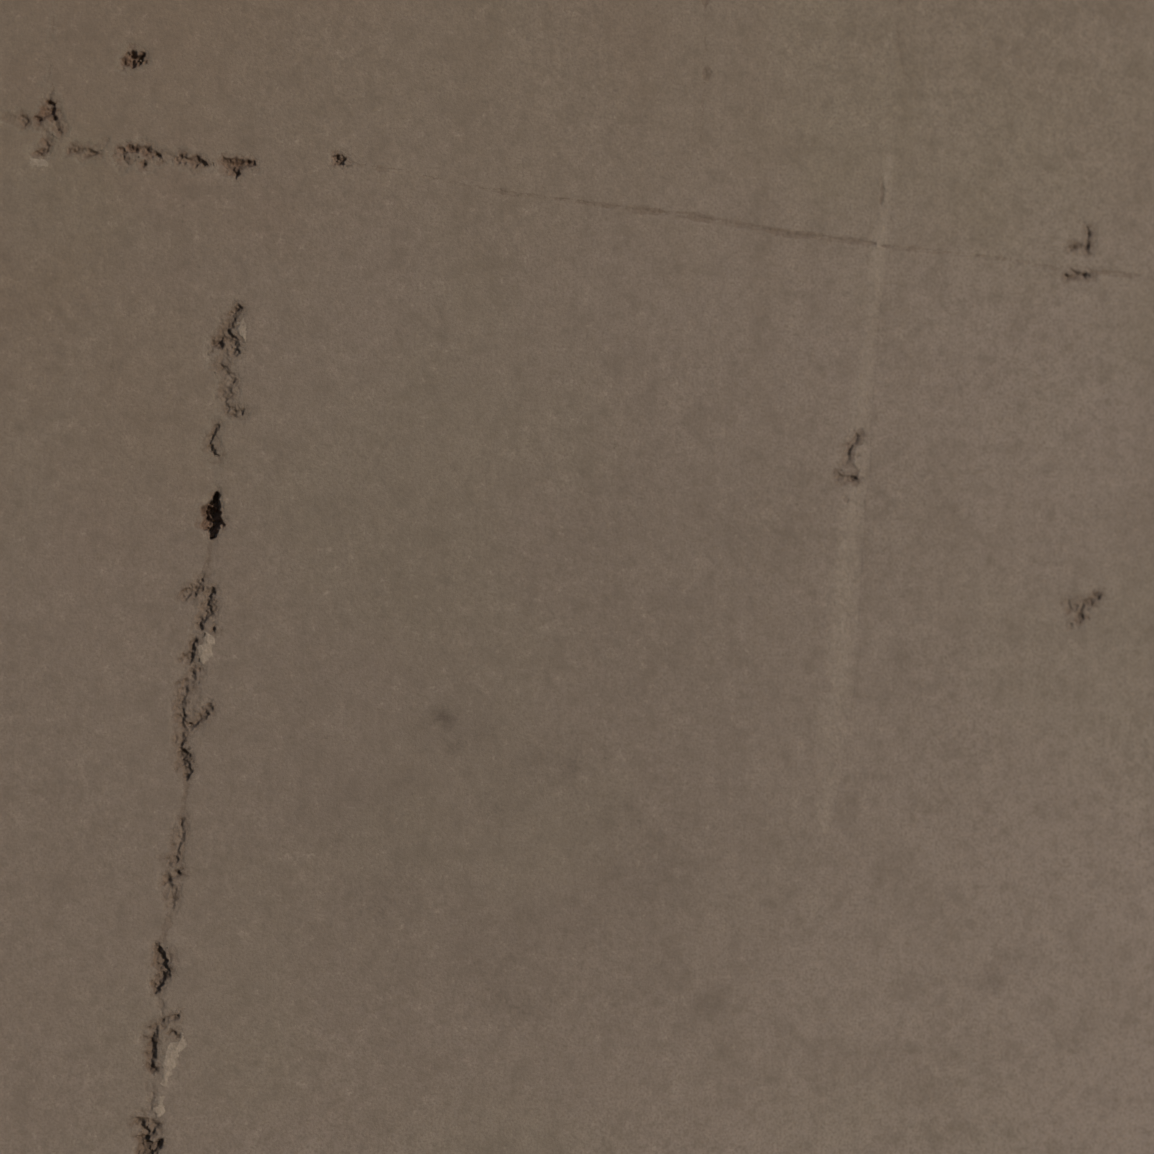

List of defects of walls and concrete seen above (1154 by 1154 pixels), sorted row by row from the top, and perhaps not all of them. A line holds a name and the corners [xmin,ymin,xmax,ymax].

crack [63,136,260,183]
crack [327,147,1062,271]
crack [126,298,253,1154]